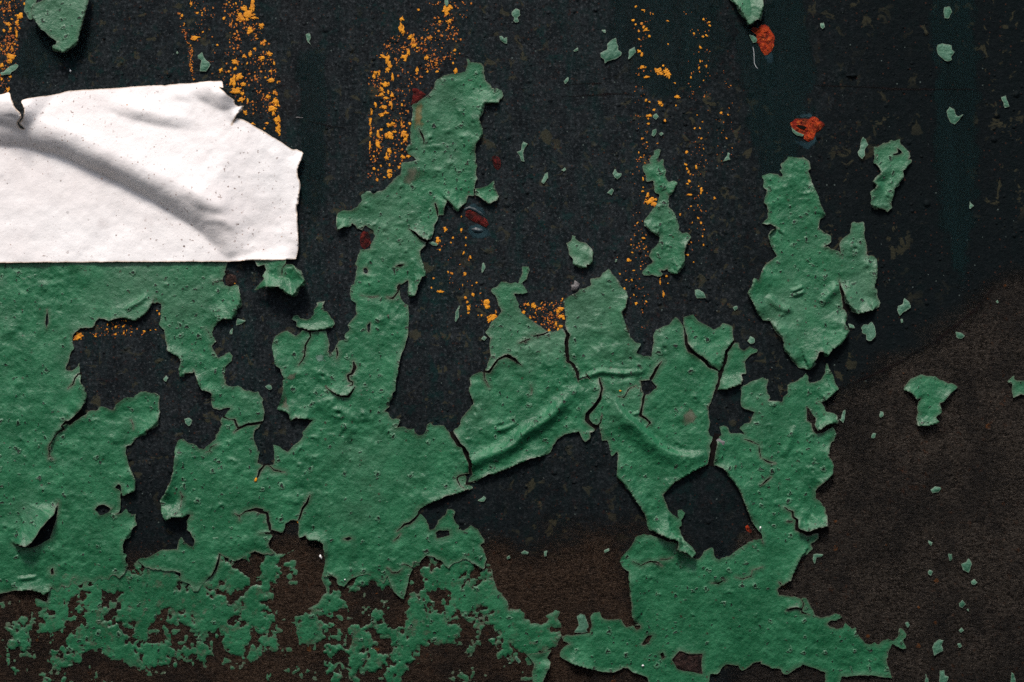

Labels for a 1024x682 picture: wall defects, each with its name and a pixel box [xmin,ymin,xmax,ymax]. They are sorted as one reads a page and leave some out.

corrosion [749,25,775,63]
corrosion [411,88,425,124]
corrosion [790,114,824,149]
peeling [0,59,562,682]
crack [483,330,662,430]
peeling [453,266,734,483]
crack [684,335,736,394]
peeling [718,343,758,390]
peeling [904,374,958,426]
crack [236,508,272,534]
crack [298,496,310,520]
peeling [560,363,906,682]